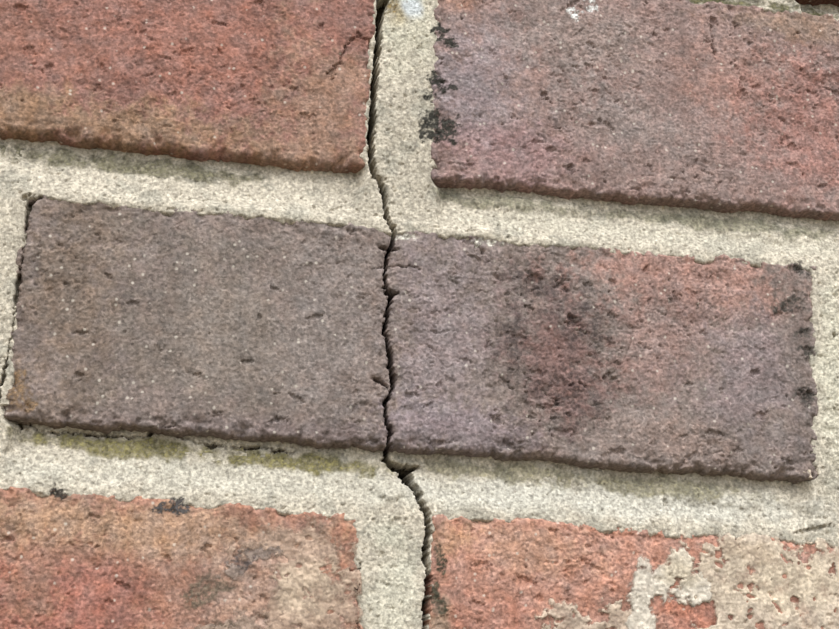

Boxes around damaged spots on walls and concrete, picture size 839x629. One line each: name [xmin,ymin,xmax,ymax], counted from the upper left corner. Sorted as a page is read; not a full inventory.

crack [327,2,384,156]
crack [381,436,415,485]
peeling [535,533,839,629]